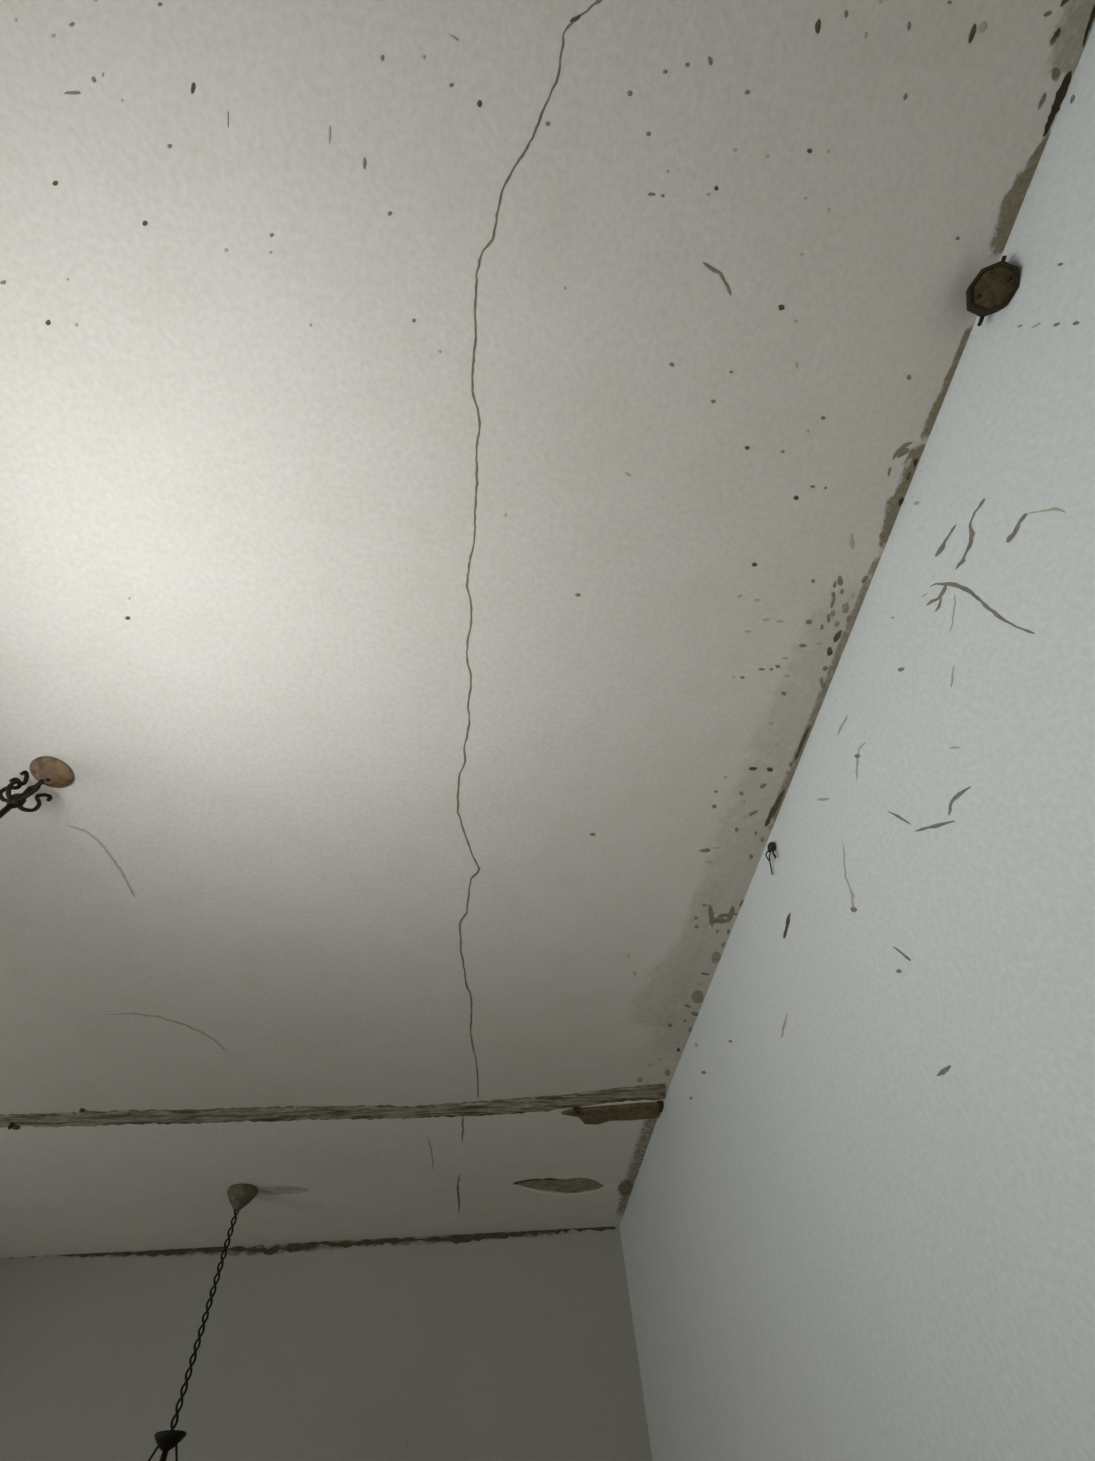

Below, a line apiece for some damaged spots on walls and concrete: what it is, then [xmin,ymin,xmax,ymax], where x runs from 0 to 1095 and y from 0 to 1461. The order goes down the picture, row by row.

leakage [1044,0,1068,44]
leakage [1039,68,1060,108]
crack [703,262,731,296]
crack [10,0,615,1259]
leakage [772,558,880,820]
crack [842,843,854,907]
leakage [708,905,735,927]
crack [783,913,791,938]
flaking render [513,1178,621,1196]